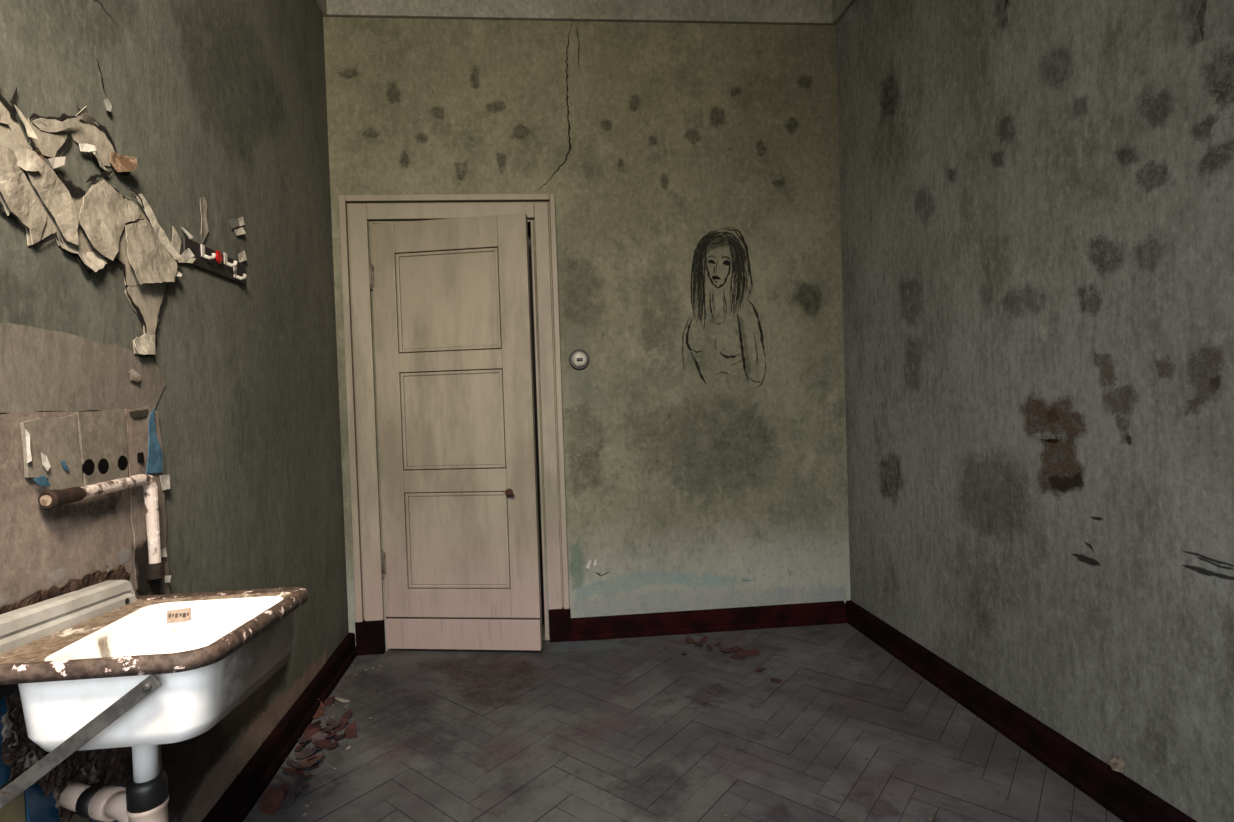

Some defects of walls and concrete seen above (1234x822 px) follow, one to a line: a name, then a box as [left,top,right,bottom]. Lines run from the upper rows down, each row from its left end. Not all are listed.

crack [535,22,580,192]
peeling [229,216,245,235]
flaking render [0,87,209,615]
leakage [1022,394,1085,496]
leakage [1094,353,1138,444]